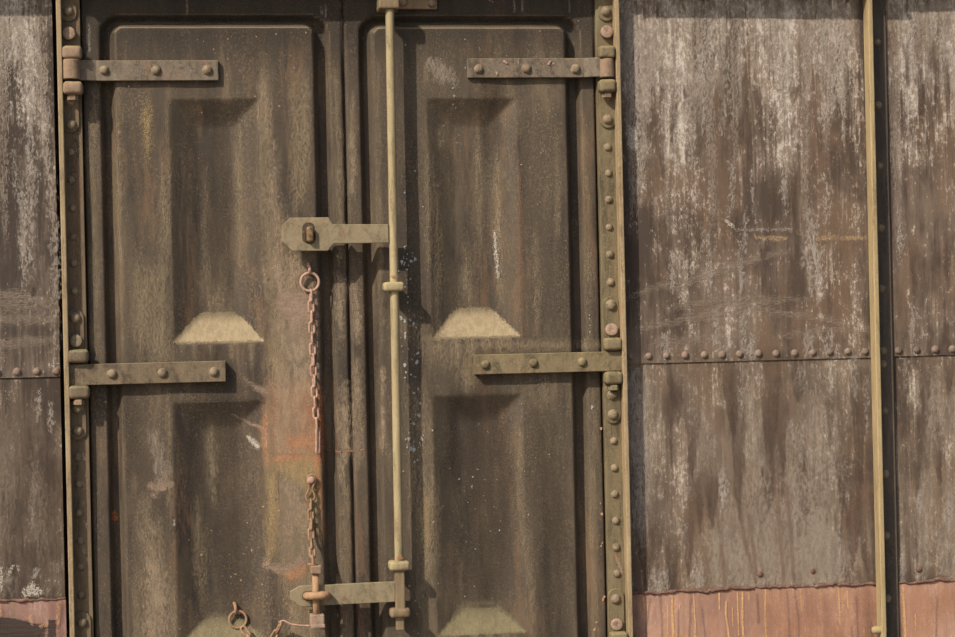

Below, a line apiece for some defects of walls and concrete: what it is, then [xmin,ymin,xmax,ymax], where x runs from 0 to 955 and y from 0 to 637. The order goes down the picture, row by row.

rust [262,381,365,580]
rust [718,592,750,637]
rust [902,584,916,637]